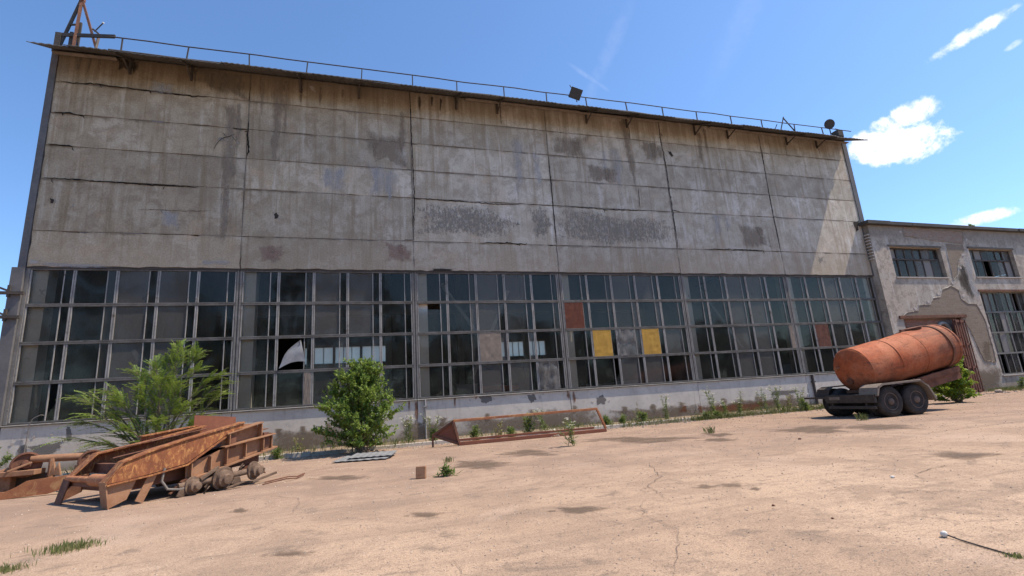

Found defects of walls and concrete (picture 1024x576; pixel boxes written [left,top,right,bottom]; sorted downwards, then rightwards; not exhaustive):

crack [62,81,209,97]
water stain [195,68,245,232]
crack [214,122,250,156]
crack [44,177,195,211]
flaking render [903,243,997,363]